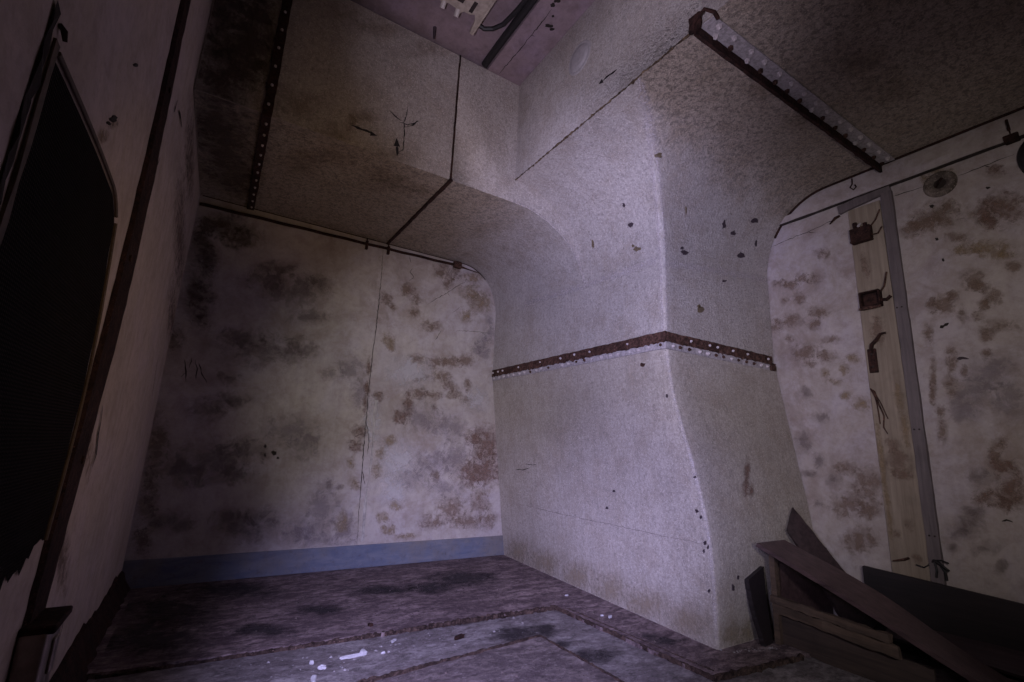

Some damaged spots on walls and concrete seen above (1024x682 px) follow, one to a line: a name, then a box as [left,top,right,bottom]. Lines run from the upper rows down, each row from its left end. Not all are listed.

damp [175,125,253,324]
damp [901,203,1019,271]
damp [927,272,1001,319]
crack [357,256,383,537]
damp [771,315,867,408]
damp [930,348,967,439]
damp [378,449,494,538]
damp [836,419,912,552]